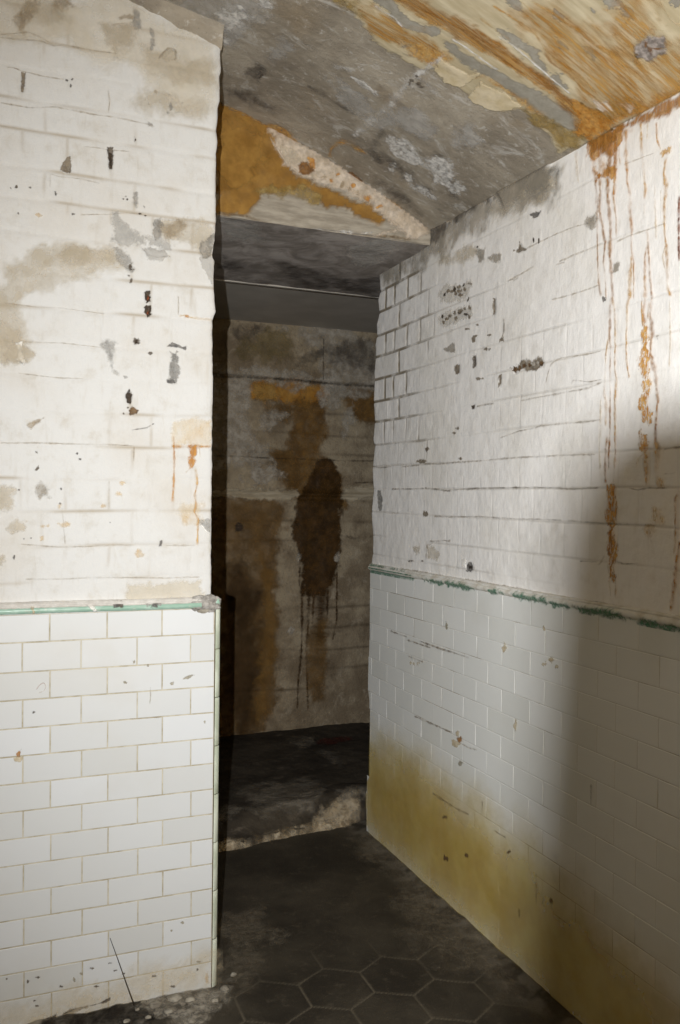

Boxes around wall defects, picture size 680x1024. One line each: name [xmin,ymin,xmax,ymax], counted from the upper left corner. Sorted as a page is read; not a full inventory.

peeling [344,0,680,153]
spalling [167,342,186,383]
spalling [200,234,214,281]
damp [212,326,376,484]
rust [216,102,385,224]
spalling [441,282,491,380]
damp [382,169,558,285]
spalling [498,357,544,387]
rust [606,303,659,482]
rust [173,445,283,735]
damp [291,458,343,705]
damp [368,761,650,1024]